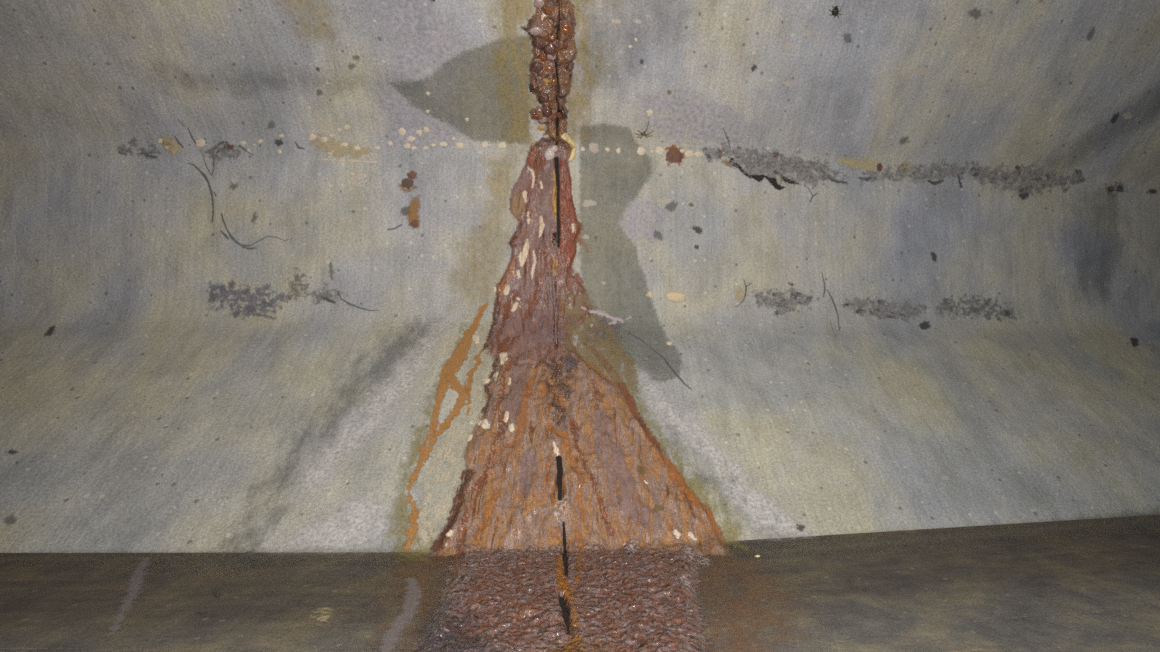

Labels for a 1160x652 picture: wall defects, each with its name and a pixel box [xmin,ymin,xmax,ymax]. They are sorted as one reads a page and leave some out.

corrosion [399,171,420,228]
crack [553,3,561,247]
spalling [702,143,1086,199]
corrosion [403,0,731,652]
crack [556,456,570,634]